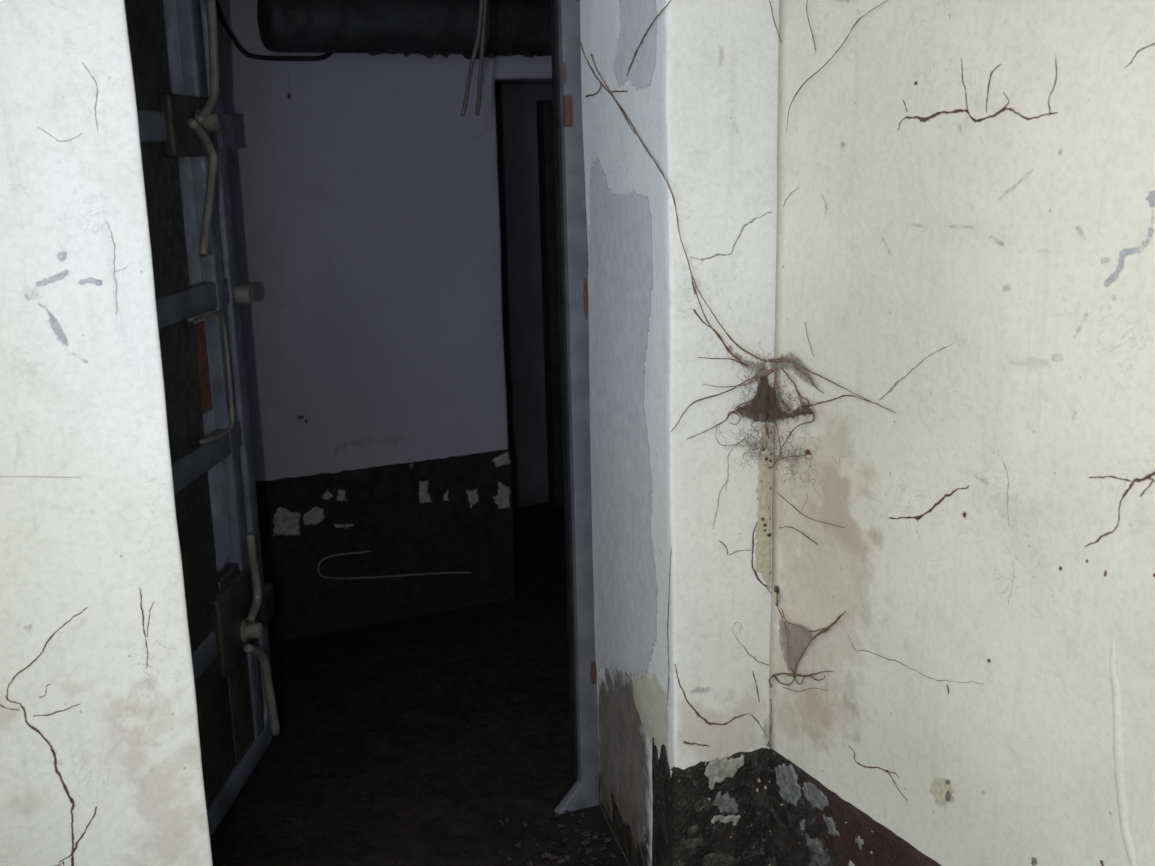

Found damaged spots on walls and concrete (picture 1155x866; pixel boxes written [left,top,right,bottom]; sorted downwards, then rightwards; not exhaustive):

crack [898,56,1058,130]
peeling [492,452,511,467]
peeling [273,489,353,537]
peeling [419,480,449,503]
peeling [466,489,479,508]
peeling [493,482,510,509]
crack [890,485,969,522]
crack [1085,471,1155,547]
crack [0,608,97,866]
peeling [693,754,745,838]
peeling [756,763,847,866]
peeling [848,831,873,866]